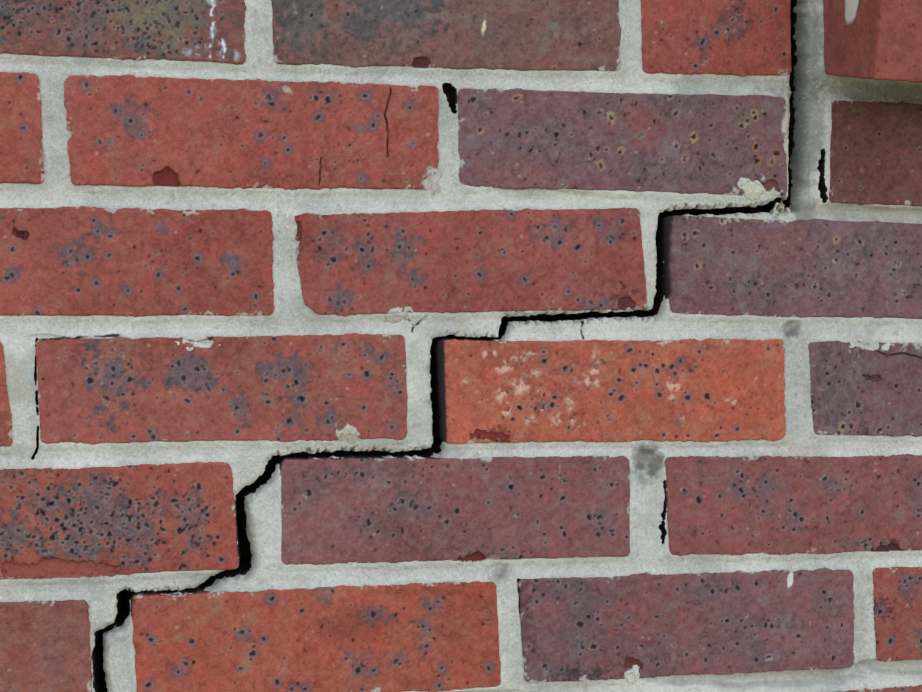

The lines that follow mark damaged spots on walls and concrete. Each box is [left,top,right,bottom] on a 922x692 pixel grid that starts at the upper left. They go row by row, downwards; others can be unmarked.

crack [383,88,391,157]
crack [658,0,798,217]
crack [42,333,119,341]
crack [447,295,665,340]
crack [313,450,344,459]
crack [369,435,443,458]
crack [155,455,280,595]
crack [91,589,132,692]